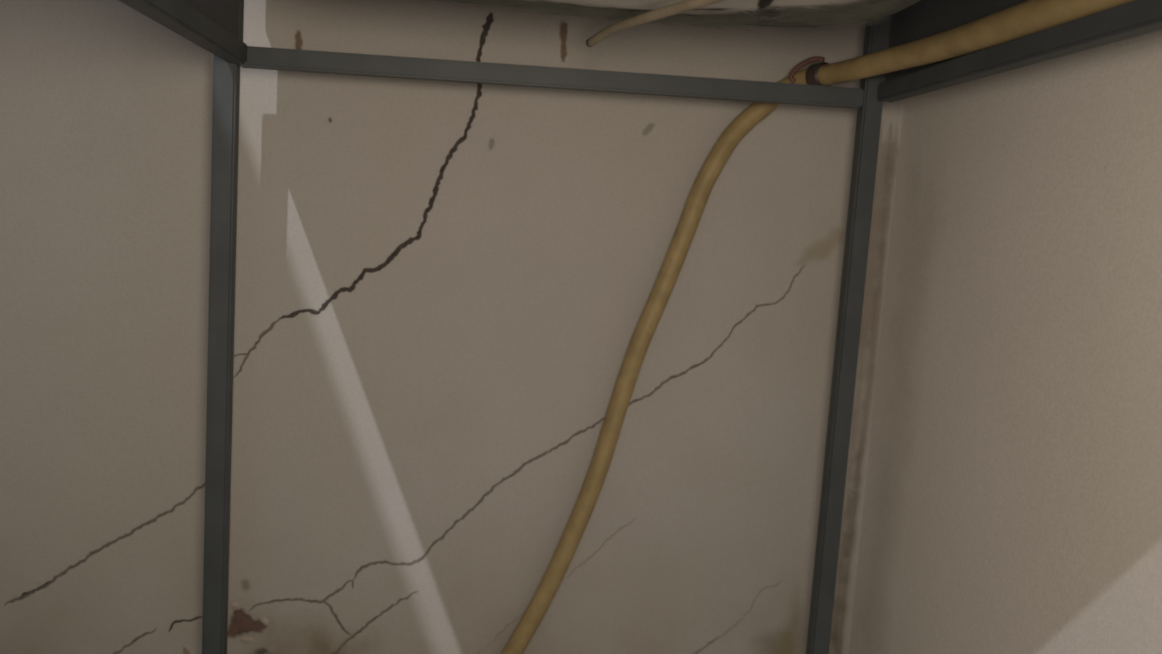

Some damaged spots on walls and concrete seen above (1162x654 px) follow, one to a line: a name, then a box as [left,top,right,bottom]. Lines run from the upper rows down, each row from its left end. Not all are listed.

crack [233,12,494,378]
crack [4,483,205,606]
crack [114,616,203,654]
crack [249,265,805,654]